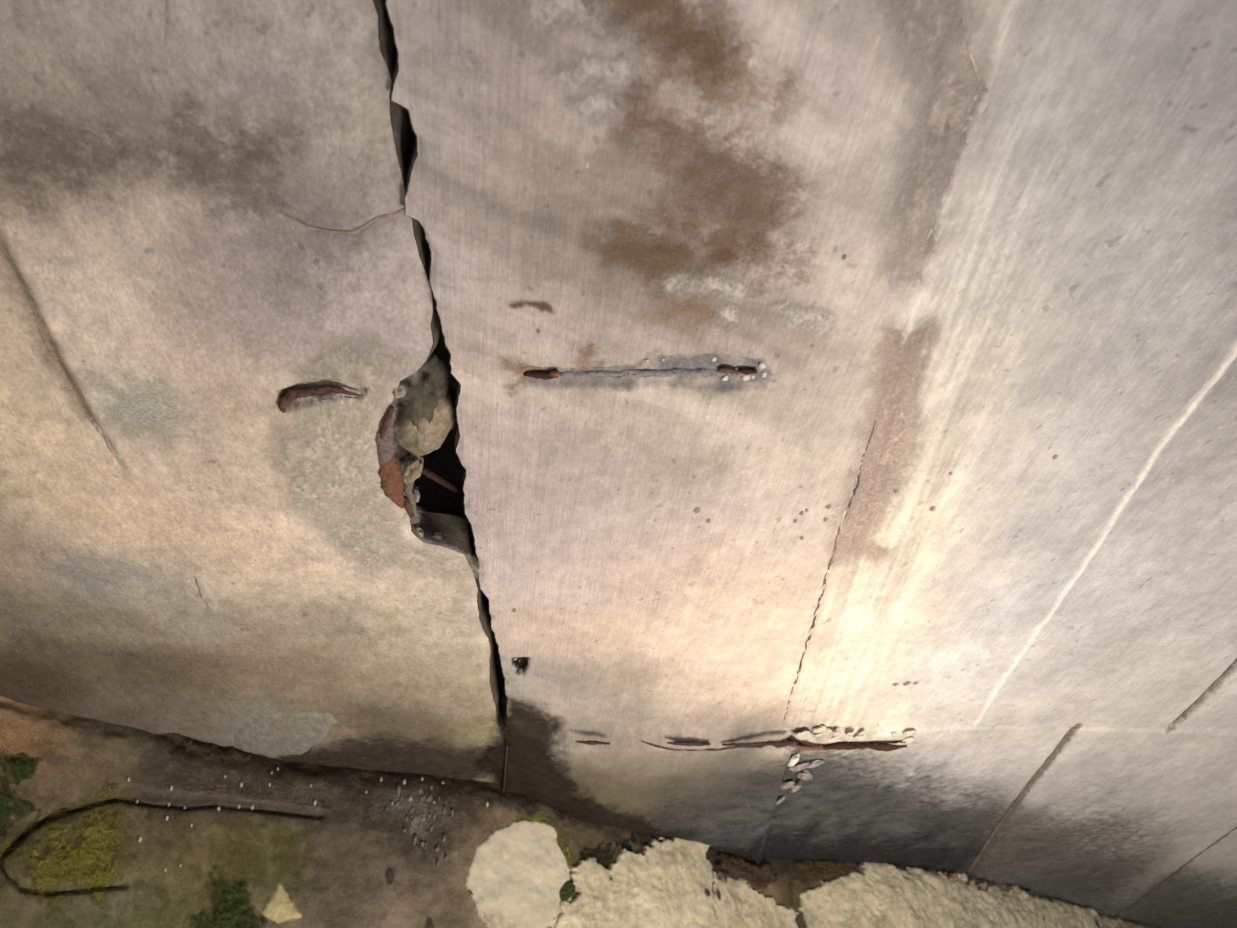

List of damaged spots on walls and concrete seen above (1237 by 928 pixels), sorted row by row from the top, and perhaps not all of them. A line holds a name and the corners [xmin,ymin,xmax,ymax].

crack [268,0,509,727]
spalling [273,345,477,578]
crack [1169,658,1237,731]
crack [0,798,238,894]
rust [641,735,907,752]
spalling [775,725,865,806]
crack [968,725,1081,873]